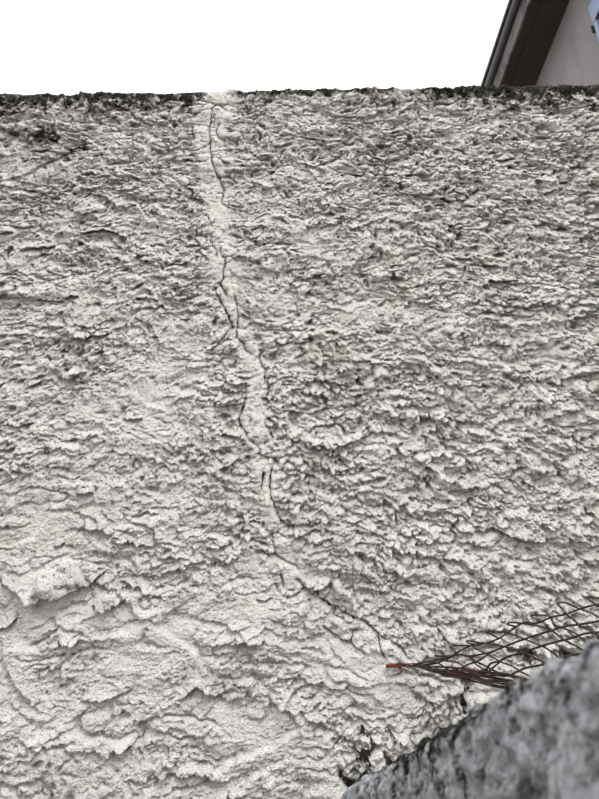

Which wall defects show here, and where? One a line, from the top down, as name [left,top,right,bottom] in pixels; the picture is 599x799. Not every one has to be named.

crack [185,99,234,207]
crack [201,218,470,719]